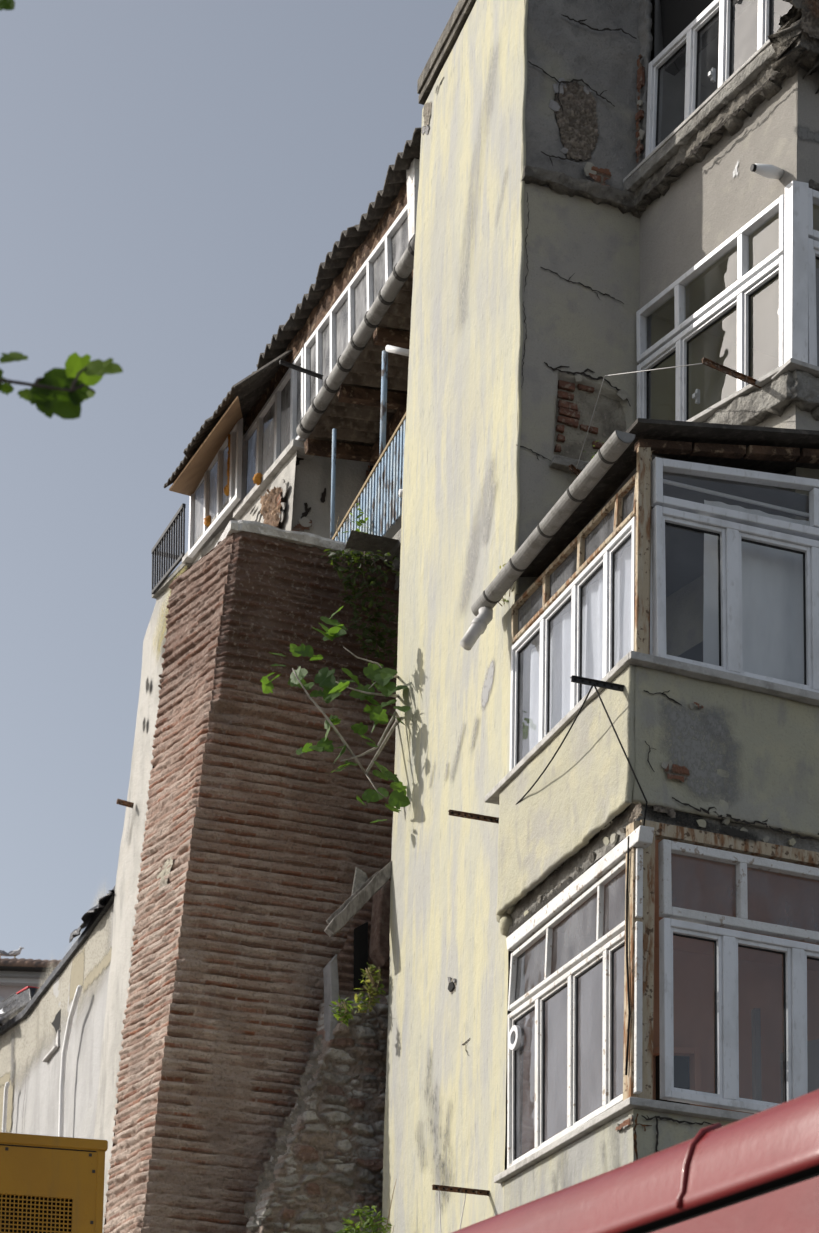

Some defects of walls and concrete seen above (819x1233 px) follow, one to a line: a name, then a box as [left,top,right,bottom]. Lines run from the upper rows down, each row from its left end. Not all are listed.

crack [561,14,636,39]
spalling [548,78,612,186]
spalling [635,54,645,163]
crack [522,193,631,406]
spalling [549,374,629,474]
spalling [260,479,312,531]
spalling [661,760,690,782]
crack [634,1113,713,1160]